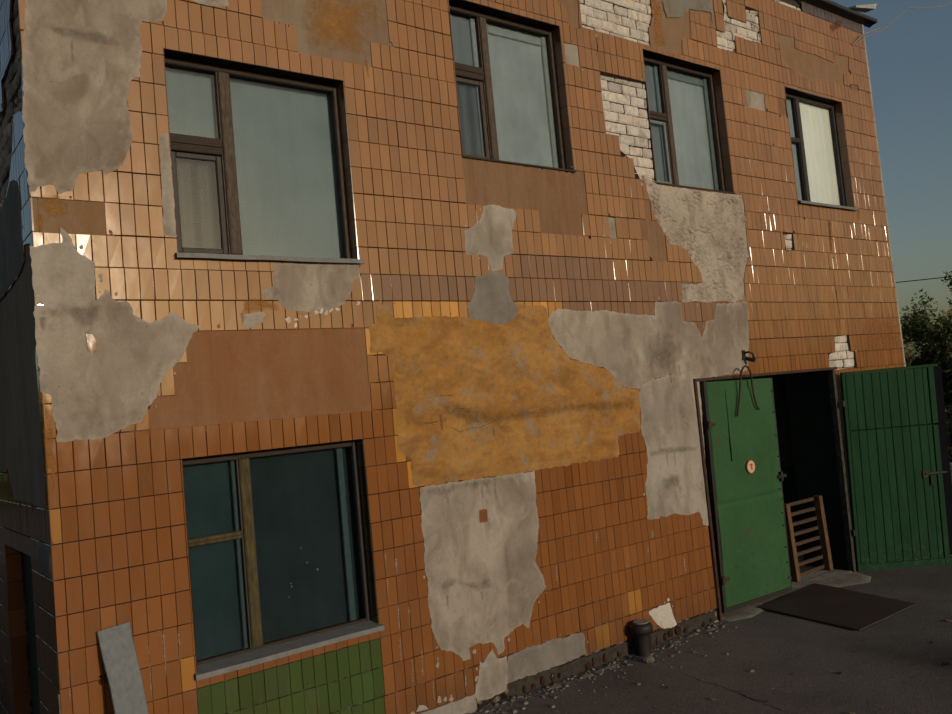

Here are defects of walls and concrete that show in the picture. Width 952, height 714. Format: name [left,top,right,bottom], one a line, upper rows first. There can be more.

spalling [259,0,393,68]
spalling [580,0,761,55]
spalling [0,0,22,206]
spalling [462,158,589,236]
spalling [600,75,749,305]
spalling [0,244,46,508]
peeling [86,334,97,354]
spalling [129,308,377,437]
peeling [479,509,488,523]
spalling [649,598,715,646]
spalling [508,639,636,698]